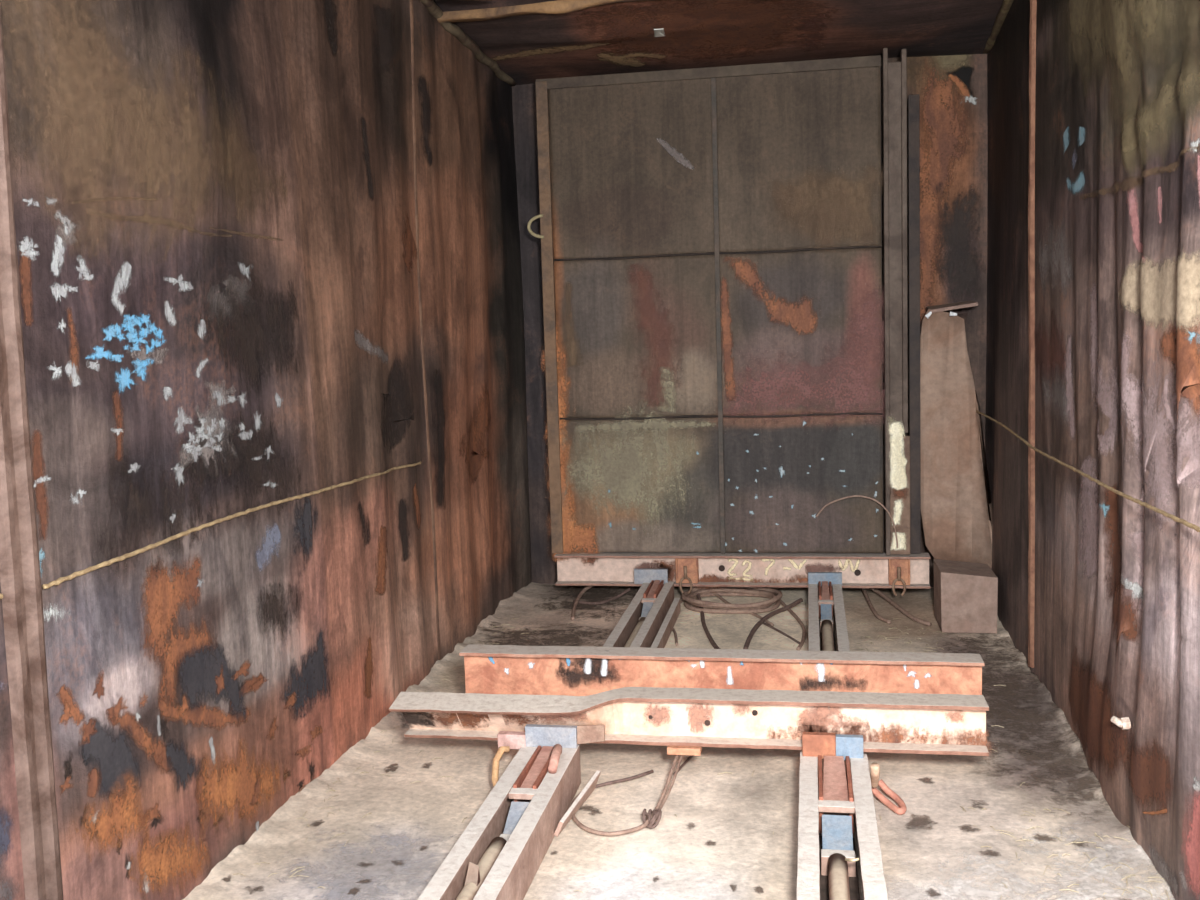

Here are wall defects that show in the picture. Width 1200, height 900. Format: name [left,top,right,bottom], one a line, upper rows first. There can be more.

rust [907,54,969,322]
rust [725,257,817,334]
rust [542,328,598,565]
rust [58,558,267,773]
peeling [177,644,246,719]
peeling [284,631,330,719]
peeling [82,719,141,798]
peeling [166,740,206,791]
peeling [0,810,12,857]
rust [83,742,285,893]